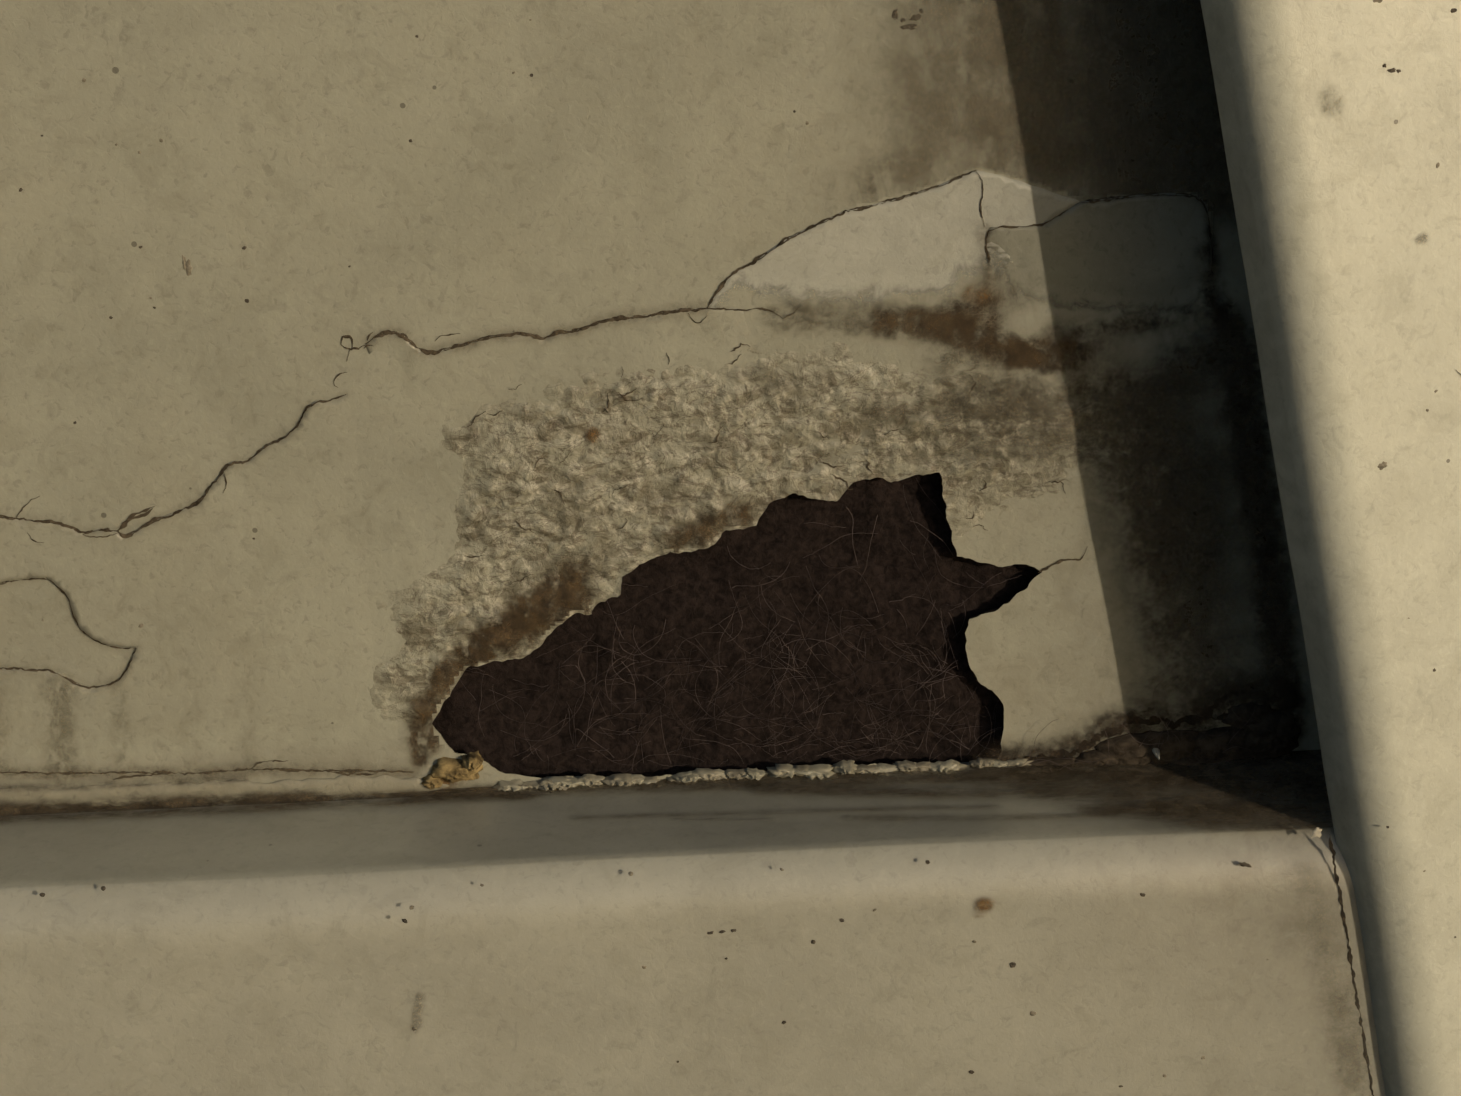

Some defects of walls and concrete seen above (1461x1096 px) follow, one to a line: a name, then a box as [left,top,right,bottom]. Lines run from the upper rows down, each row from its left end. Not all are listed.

leakage [966,0,1235,216]
crack [0,170,1213,543]
rust [873,274,1087,372]
leakage [771,247,1305,728]
peeling [0,393,374,757]
crack [1038,548,1087,573]
crack [0,578,136,689]
crack [0,760,414,812]
spalling [492,758,1033,793]